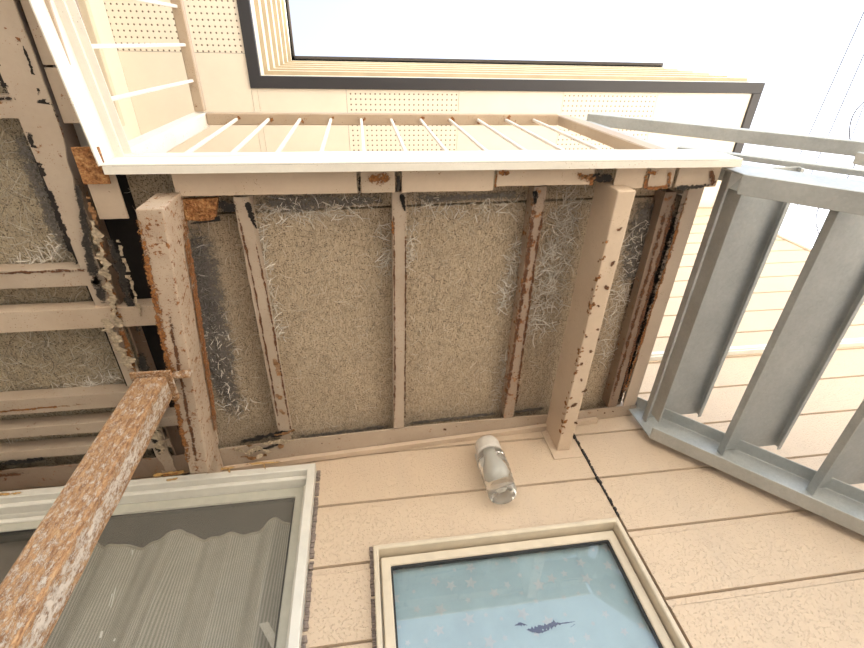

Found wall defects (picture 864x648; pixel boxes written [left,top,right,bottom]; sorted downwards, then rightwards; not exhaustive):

rust [0,457,46,477]
rust [0,132,150,372]
rust [136,220,198,481]
rust [181,208,219,442]
rust [238,200,291,429]
peeling [234,429,296,460]
rust [358,173,406,211]
rust [391,216,407,422]
rust [504,190,545,408]
rust [559,328,600,434]
rust [578,173,613,186]
rust [612,170,716,400]